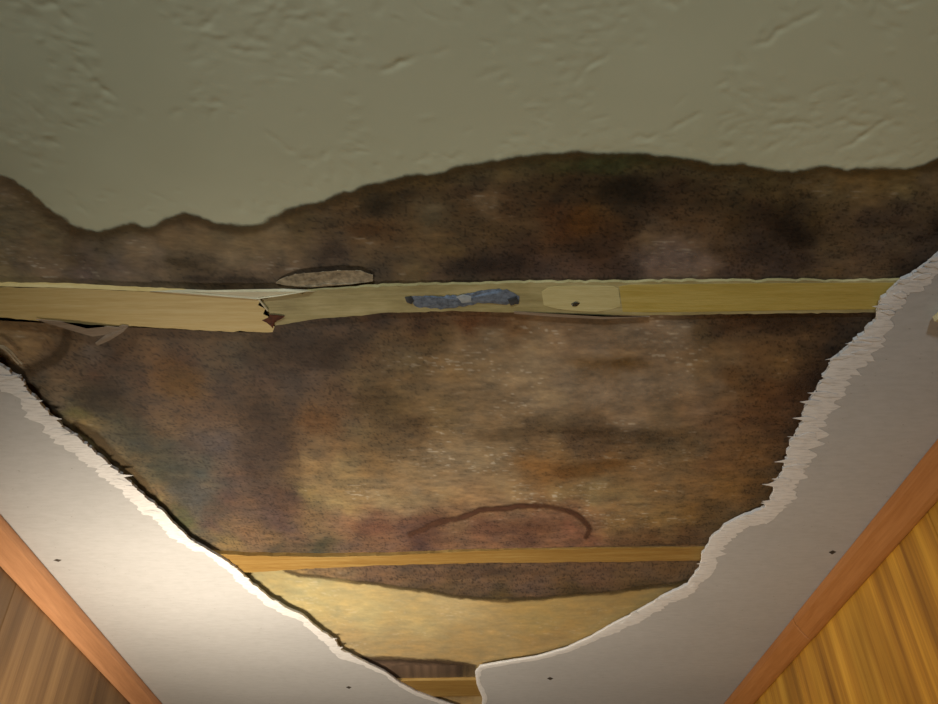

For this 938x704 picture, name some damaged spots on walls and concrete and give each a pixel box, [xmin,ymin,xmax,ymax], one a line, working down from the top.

leakage [0,152,938,290]
peeling [41,415,75,439]
leakage [0,311,876,553]
peeling [99,465,134,490]
peeling [763,478,791,488]